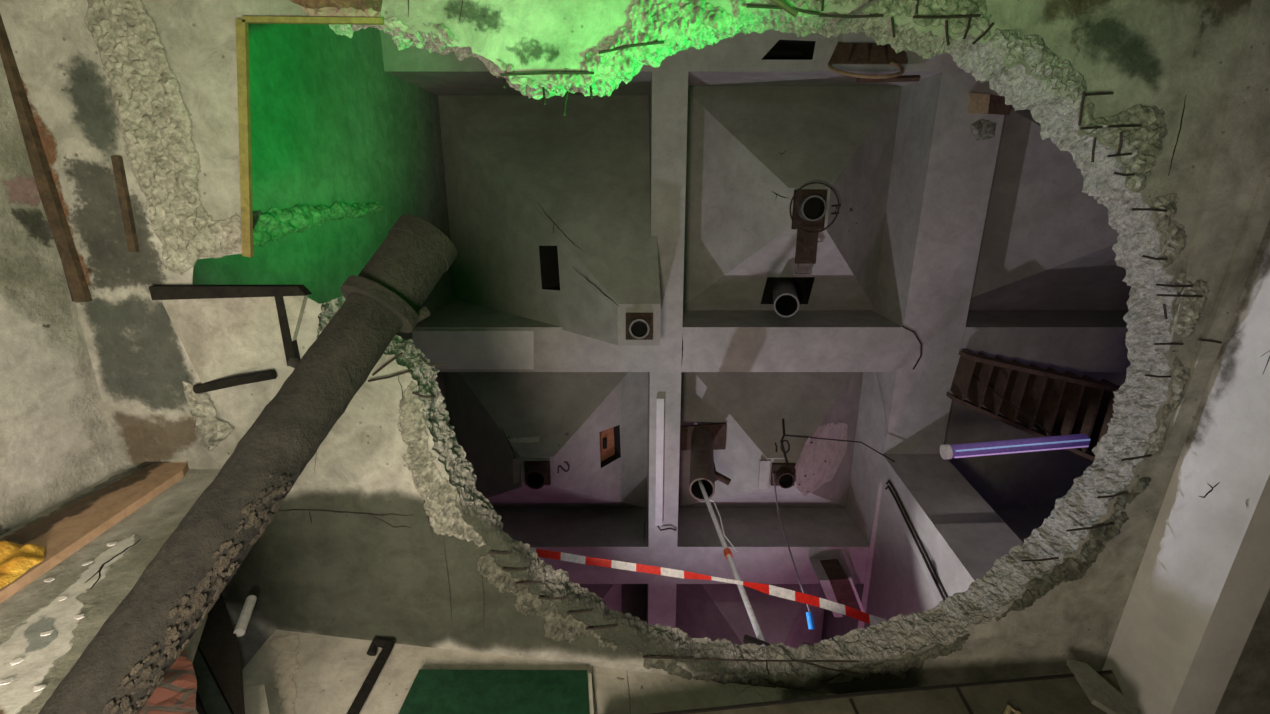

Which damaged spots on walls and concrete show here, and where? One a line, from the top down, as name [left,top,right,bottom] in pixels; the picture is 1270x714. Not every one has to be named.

leakage [68,57,117,153]
leakage [0,160,196,544]
spalling [317,296,346,338]
spalling [328,0,1222,702]
leakage [1218,220,1270,381]